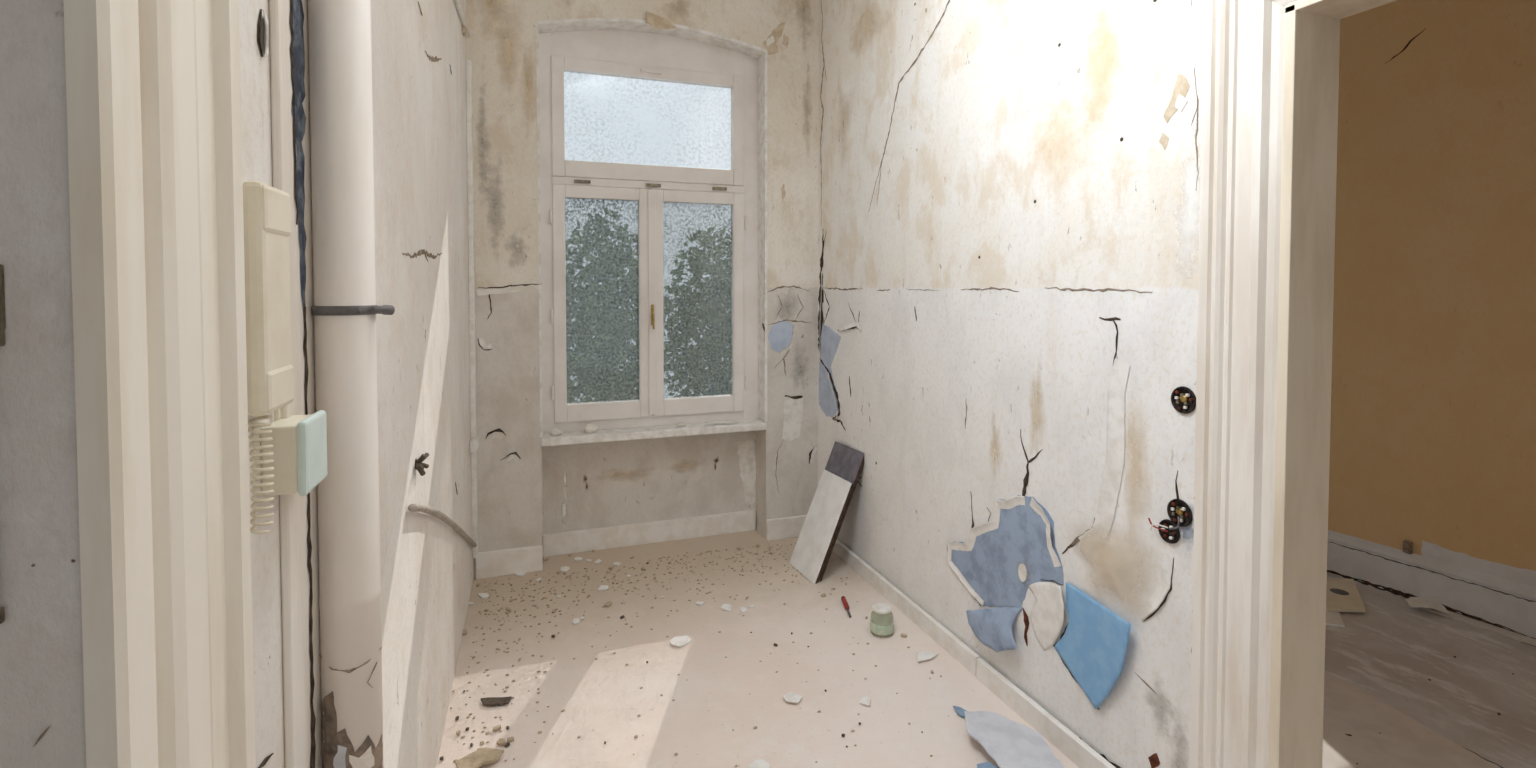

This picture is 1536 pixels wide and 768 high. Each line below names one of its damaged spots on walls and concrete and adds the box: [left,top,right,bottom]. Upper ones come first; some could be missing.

crack [818,6,862,396]
crack [868,0,950,212]
crack [1191,68,1199,188]
peeling [768,286,845,441]
peeling [947,429,1131,710]
peeling [321,691,383,768]